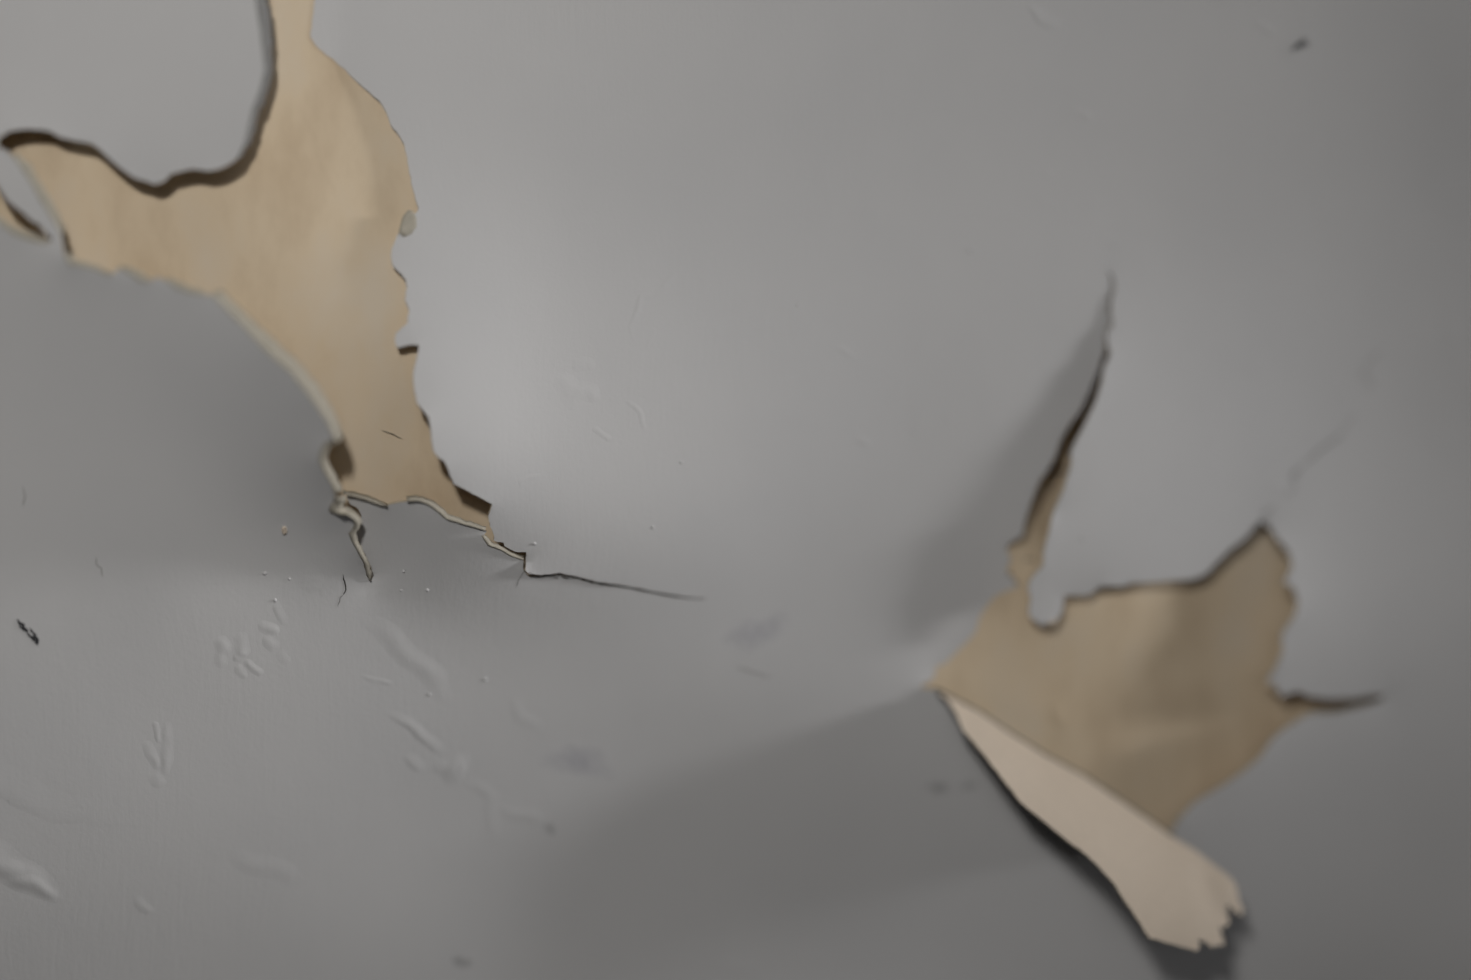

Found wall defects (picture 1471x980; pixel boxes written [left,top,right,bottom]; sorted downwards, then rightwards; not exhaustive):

peeling [0,0,701,599]
peeling [920,276,1383,951]